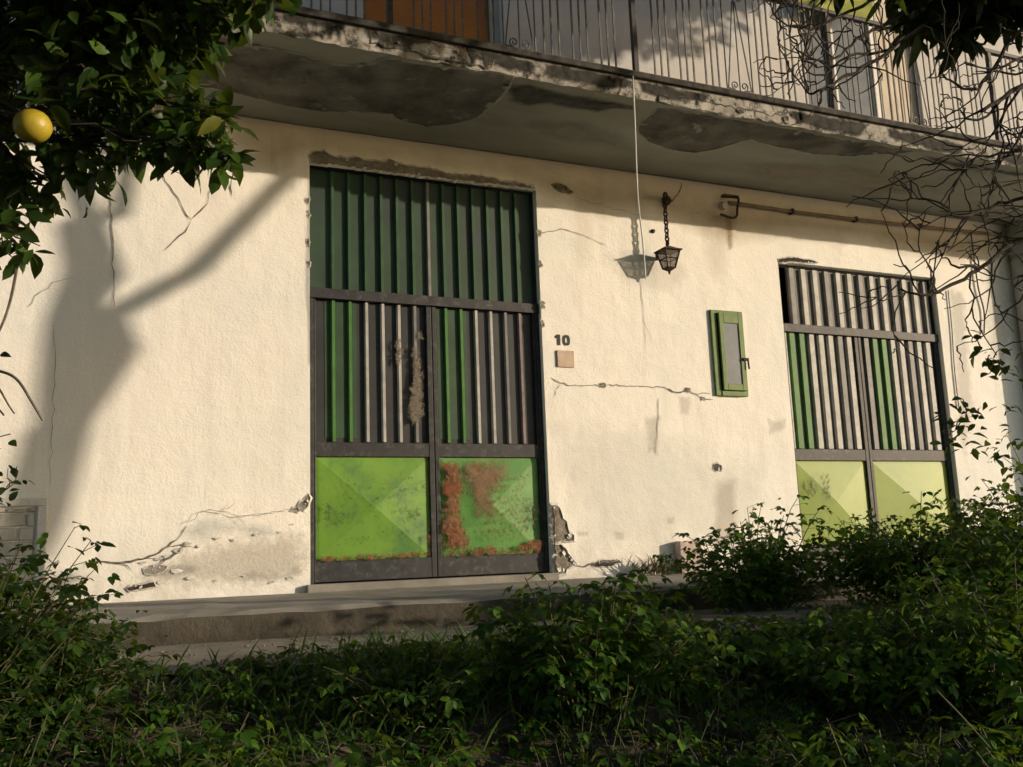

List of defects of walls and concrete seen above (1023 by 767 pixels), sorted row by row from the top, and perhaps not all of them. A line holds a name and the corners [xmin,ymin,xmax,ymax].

peeling [192,30,516,127]
peeling [636,93,923,157]
spalling [307,148,536,191]
crack [551,377,713,441]
crack [88,502,289,570]
corrosion [440,461,542,557]
spalling [548,502,577,577]
spalling [590,558,620,568]